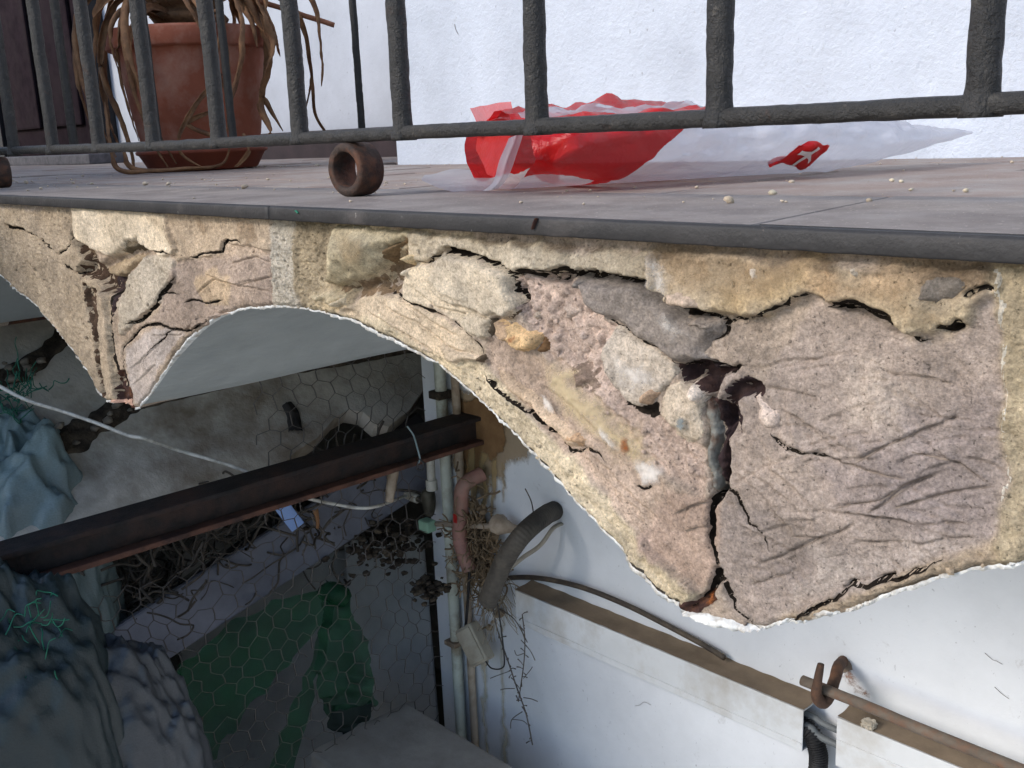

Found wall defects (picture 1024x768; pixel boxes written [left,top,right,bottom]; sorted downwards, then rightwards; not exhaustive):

spalling [78,241,148,397]
crack [110,239,244,393]
spalling [311,250,417,308]
crack [389,288,602,457]
spalling [428,253,766,490]
crack [419,247,995,373]
peeling [994,269,1007,331]
crack [770,433,830,457]
crack [692,468,769,627]
peeling [682,590,792,633]
peeling [813,593,883,619]
crack [789,559,943,622]